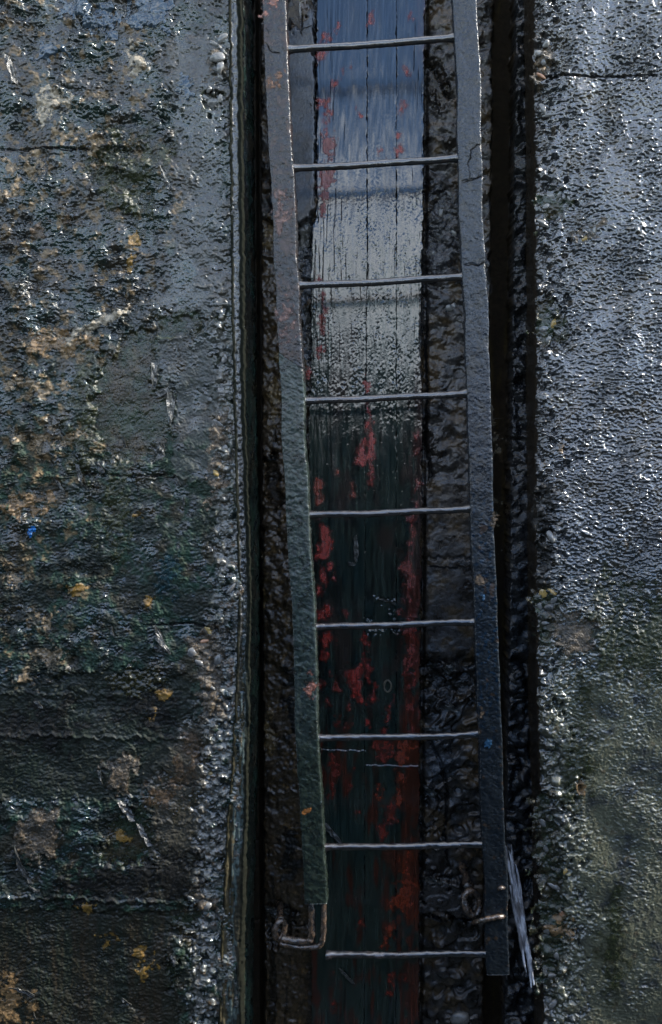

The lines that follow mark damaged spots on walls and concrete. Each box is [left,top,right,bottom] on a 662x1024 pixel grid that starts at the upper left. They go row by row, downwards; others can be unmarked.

crack [543,73,660,81]
crack [2,145,141,153]
peeling [355,407,375,485]
peeling [314,478,336,621]
peeling [319,631,377,729]
peeling [372,479,424,842]
peeling [380,850,418,949]